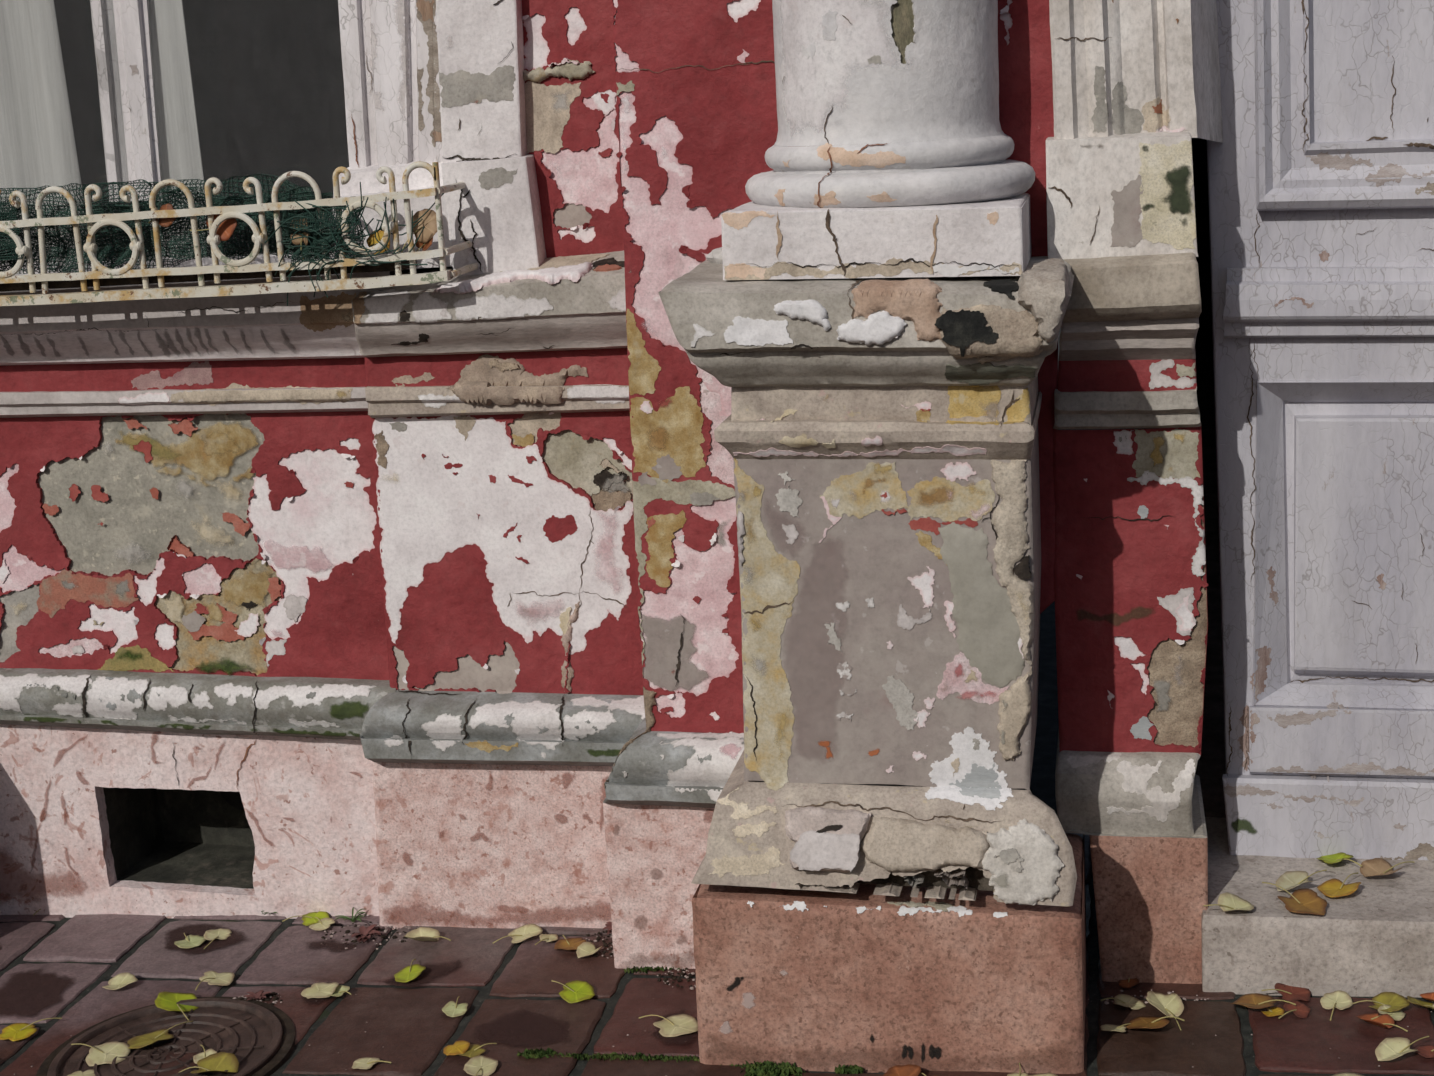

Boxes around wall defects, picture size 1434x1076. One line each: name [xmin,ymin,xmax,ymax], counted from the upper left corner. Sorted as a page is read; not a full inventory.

flaking render [1091,66,1196,250]
crack [743,104,1014,344]
peeling [1274,297,1314,308]
peeling [1149,359,1196,390]
peeling [0,0,1069,918]
spalling [1066,429,1208,822]
peeling [1266,566,1279,606]
crack [82,675,91,718]
crack [236,682,259,789]
crack [398,690,477,759]
peeling [1223,646,1434,809]
crack [784,801,1003,823]